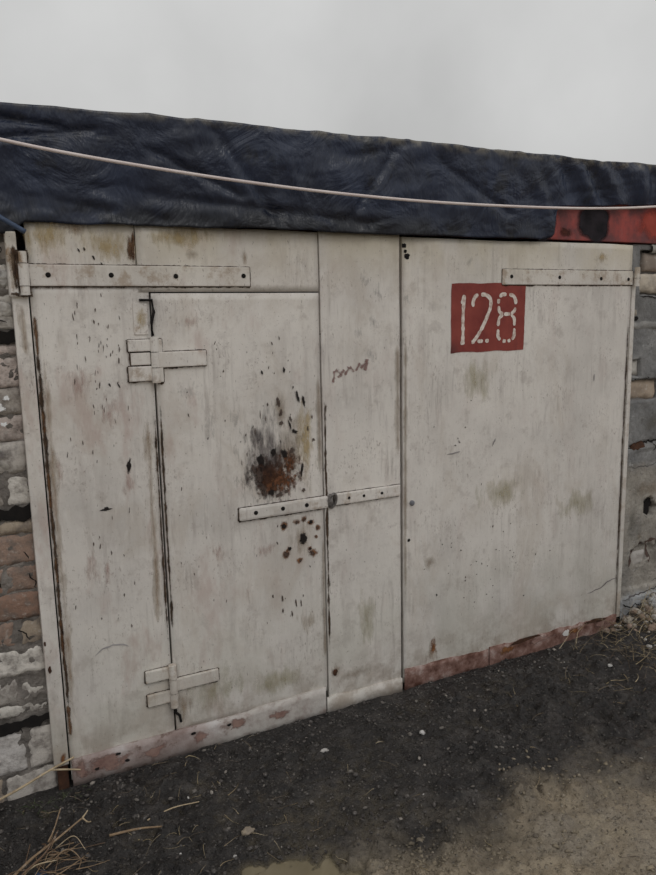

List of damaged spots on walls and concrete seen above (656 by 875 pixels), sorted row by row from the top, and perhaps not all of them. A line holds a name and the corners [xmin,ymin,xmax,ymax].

rust [241,386,328,499]
rust [23,318,72,735]
spalling [628,537,656,567]